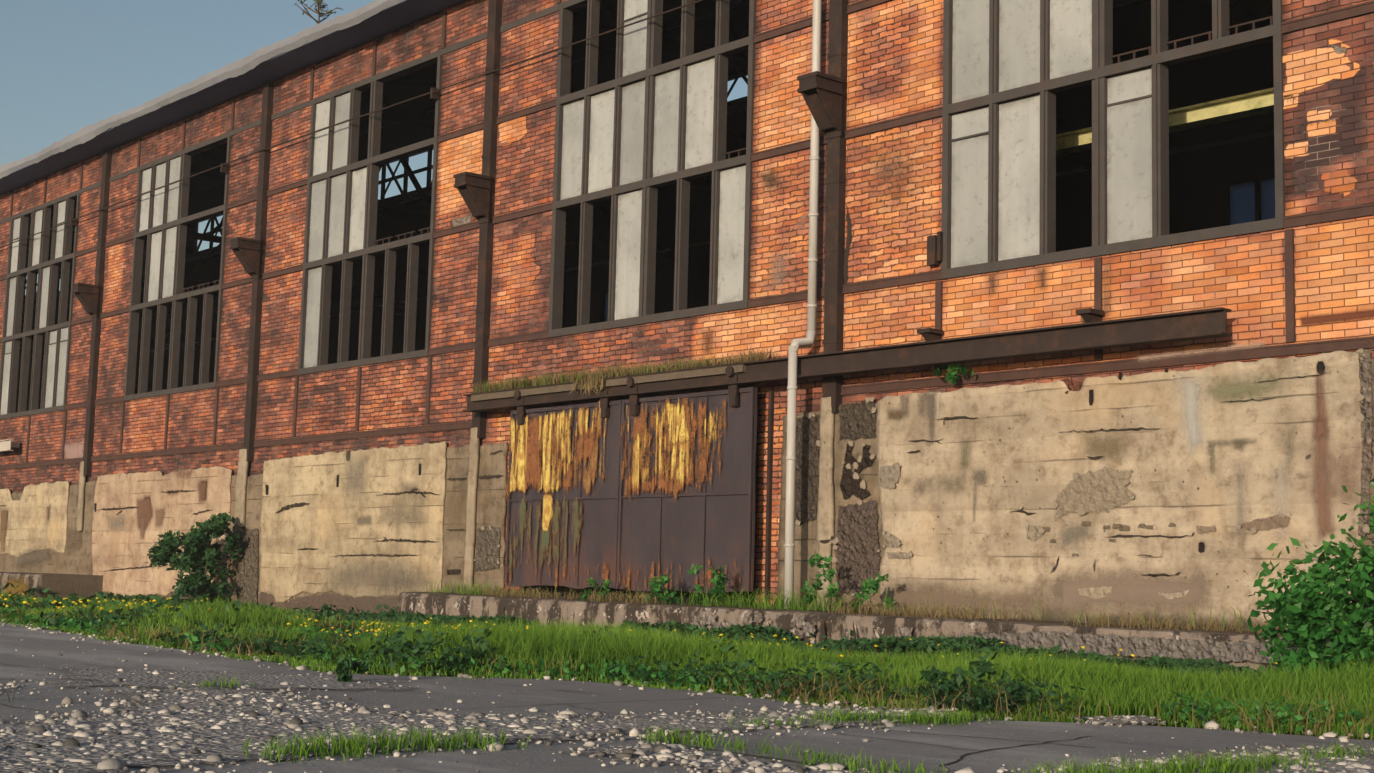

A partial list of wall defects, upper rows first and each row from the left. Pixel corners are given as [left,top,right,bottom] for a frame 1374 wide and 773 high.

peeling [1283,39,1374,159]
peeling [1321,169,1357,196]
spalling [795,413,820,526]
spalling [832,397,881,596]